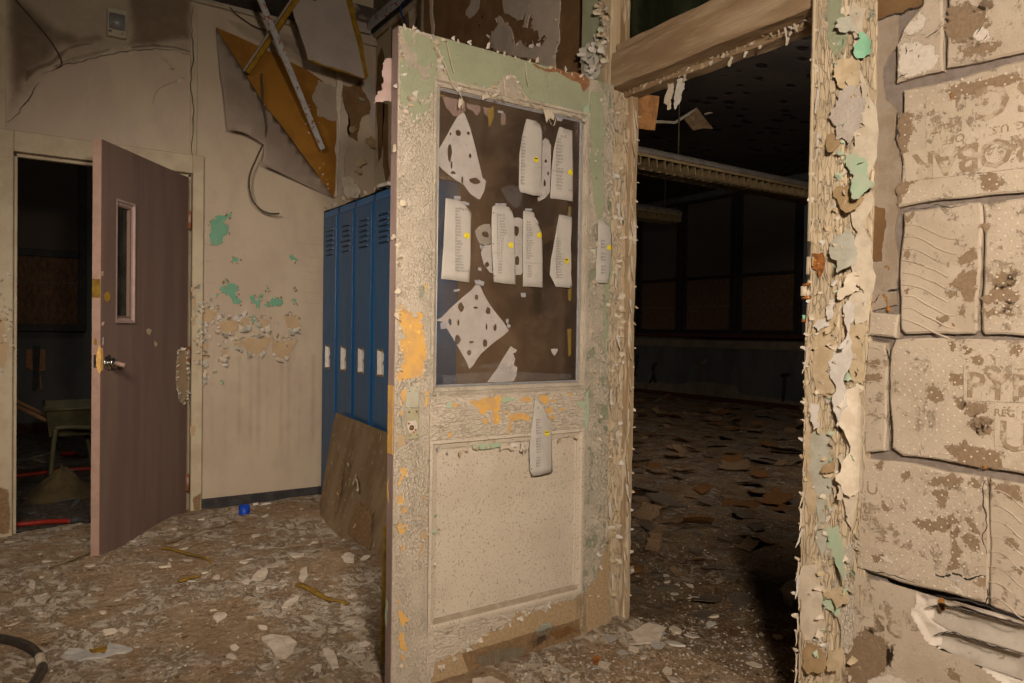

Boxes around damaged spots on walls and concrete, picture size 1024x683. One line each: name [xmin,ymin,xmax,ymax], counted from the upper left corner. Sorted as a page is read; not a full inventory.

crack [8,48,184,122]
flaking render [324,0,611,209]
spalling [973,26,990,41]
peeling [208,212,232,245]
peeling [176,278,301,406]
peeling [394,288,428,416]
flaking render [431,0,942,683]